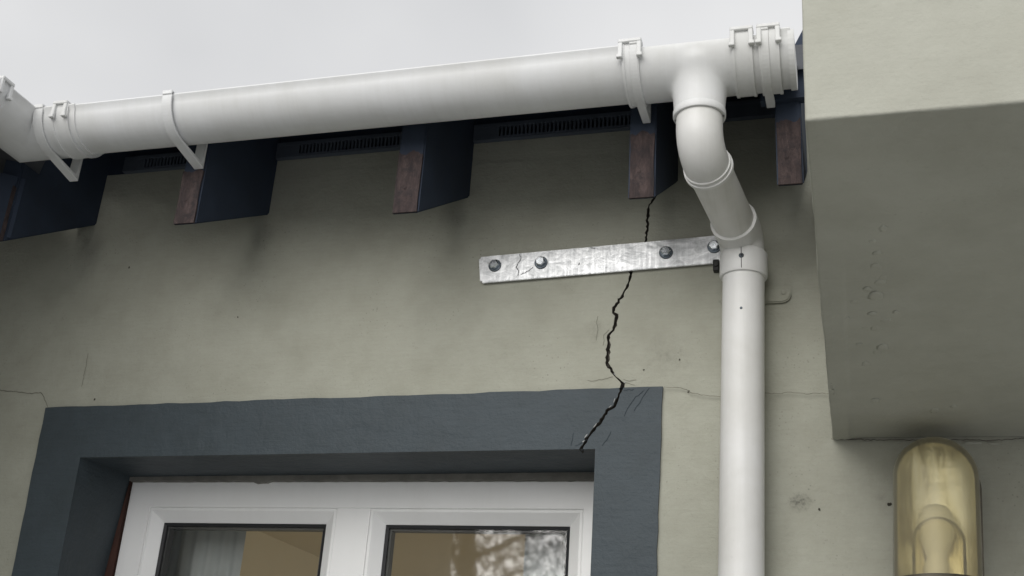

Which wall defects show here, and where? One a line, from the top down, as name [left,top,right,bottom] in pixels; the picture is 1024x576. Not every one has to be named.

crack [645,197,656,242]
crack [571,271,721,453]